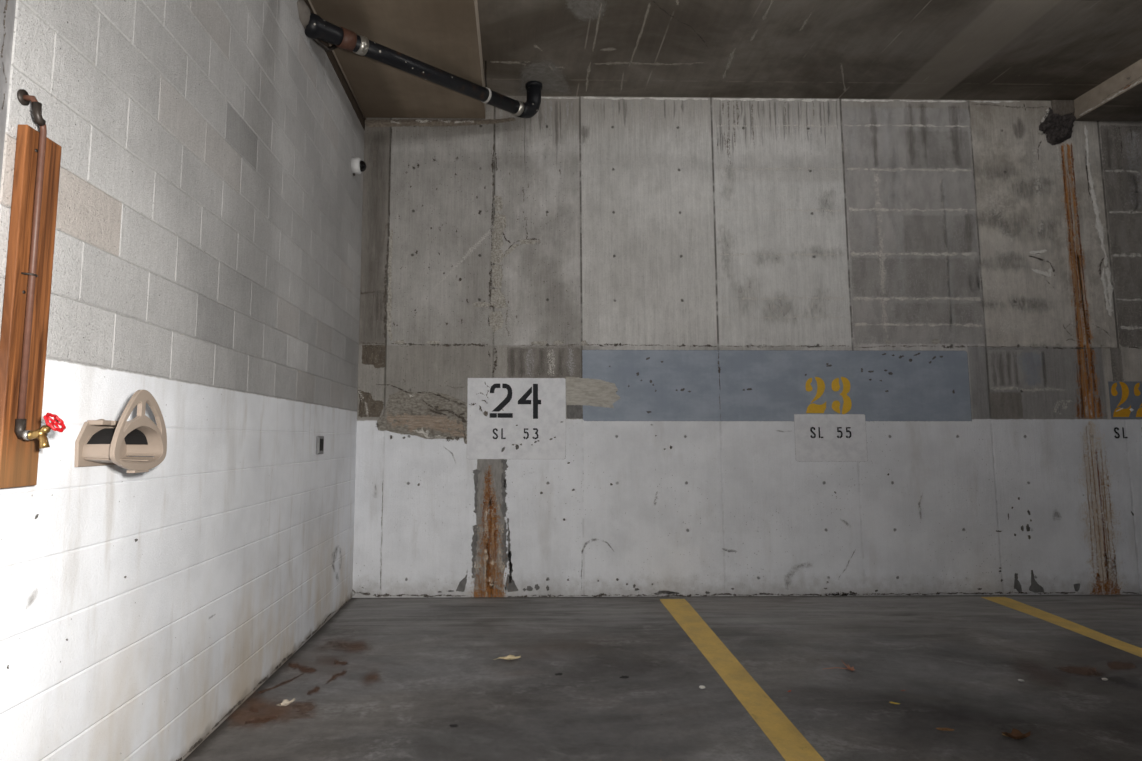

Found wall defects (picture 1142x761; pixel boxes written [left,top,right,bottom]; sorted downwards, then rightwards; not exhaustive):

spalling [1037,100,1076,160]
crack [360,109,1139,441]
flaking render [376,390,467,444]
corrosion [1056,143,1128,595]
corrosion [468,464,509,597]